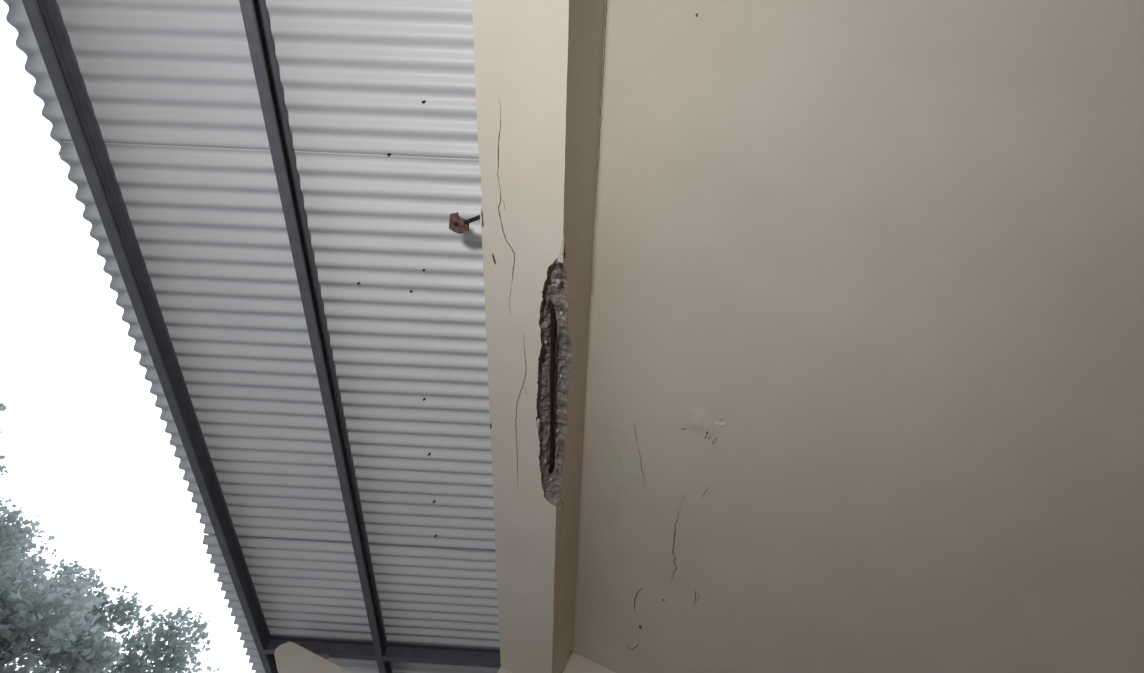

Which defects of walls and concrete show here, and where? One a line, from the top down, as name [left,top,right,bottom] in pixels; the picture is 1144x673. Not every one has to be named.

crack [490,100,527,483]
spalling [536,237,572,507]
crack [671,489,708,605]